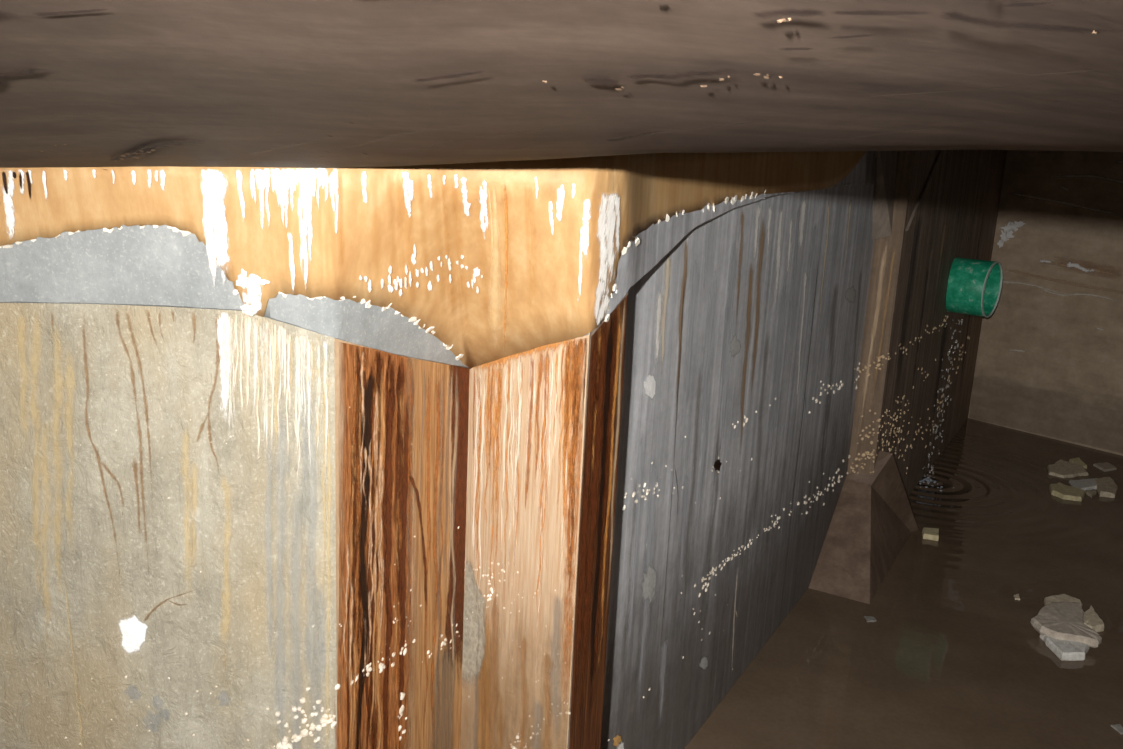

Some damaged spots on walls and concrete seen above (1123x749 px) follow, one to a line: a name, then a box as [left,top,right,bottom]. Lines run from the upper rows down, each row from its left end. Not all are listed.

rust [2,172,31,197]
leakage [3,170,47,236]
peeling [0,225,244,310]
leakage [359,171,508,337]
peeling [270,292,472,369]
leakage [600,199,970,749]
rust [336,295,628,749]
spalling [119,615,148,653]
crack [145,594,184,620]
leakage [335,639,416,690]
leakage [266,687,337,749]
leakage [398,692,407,740]